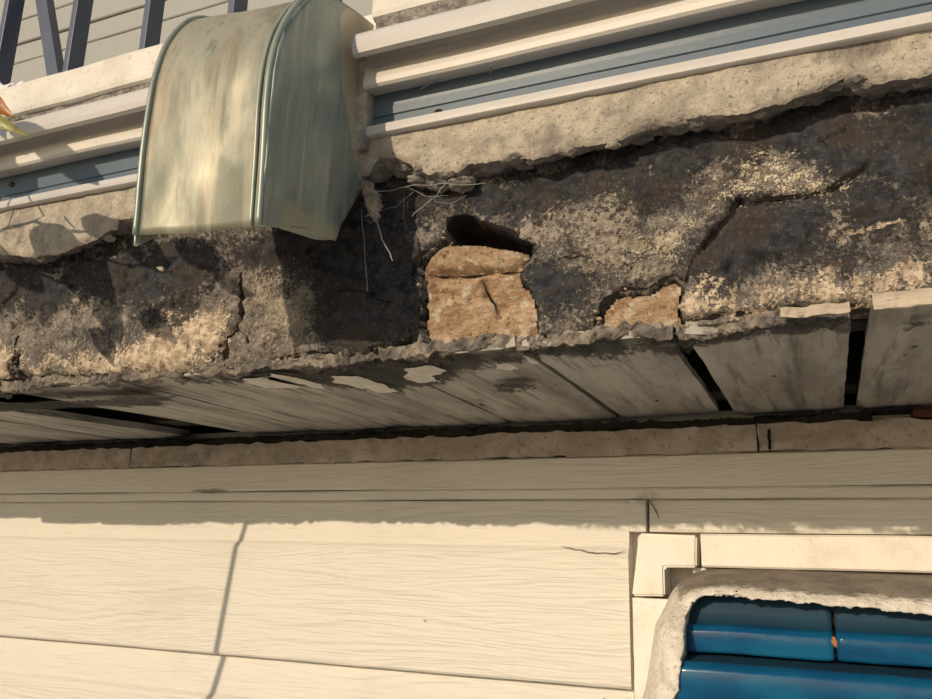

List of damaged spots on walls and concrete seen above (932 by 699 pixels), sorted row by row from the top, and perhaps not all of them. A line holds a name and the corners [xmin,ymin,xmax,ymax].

spalling [362,74,932,194]
crack [148,272,249,367]
spalling [0,214,851,400]
water stain [0,88,932,379]
crack [558,169,865,328]